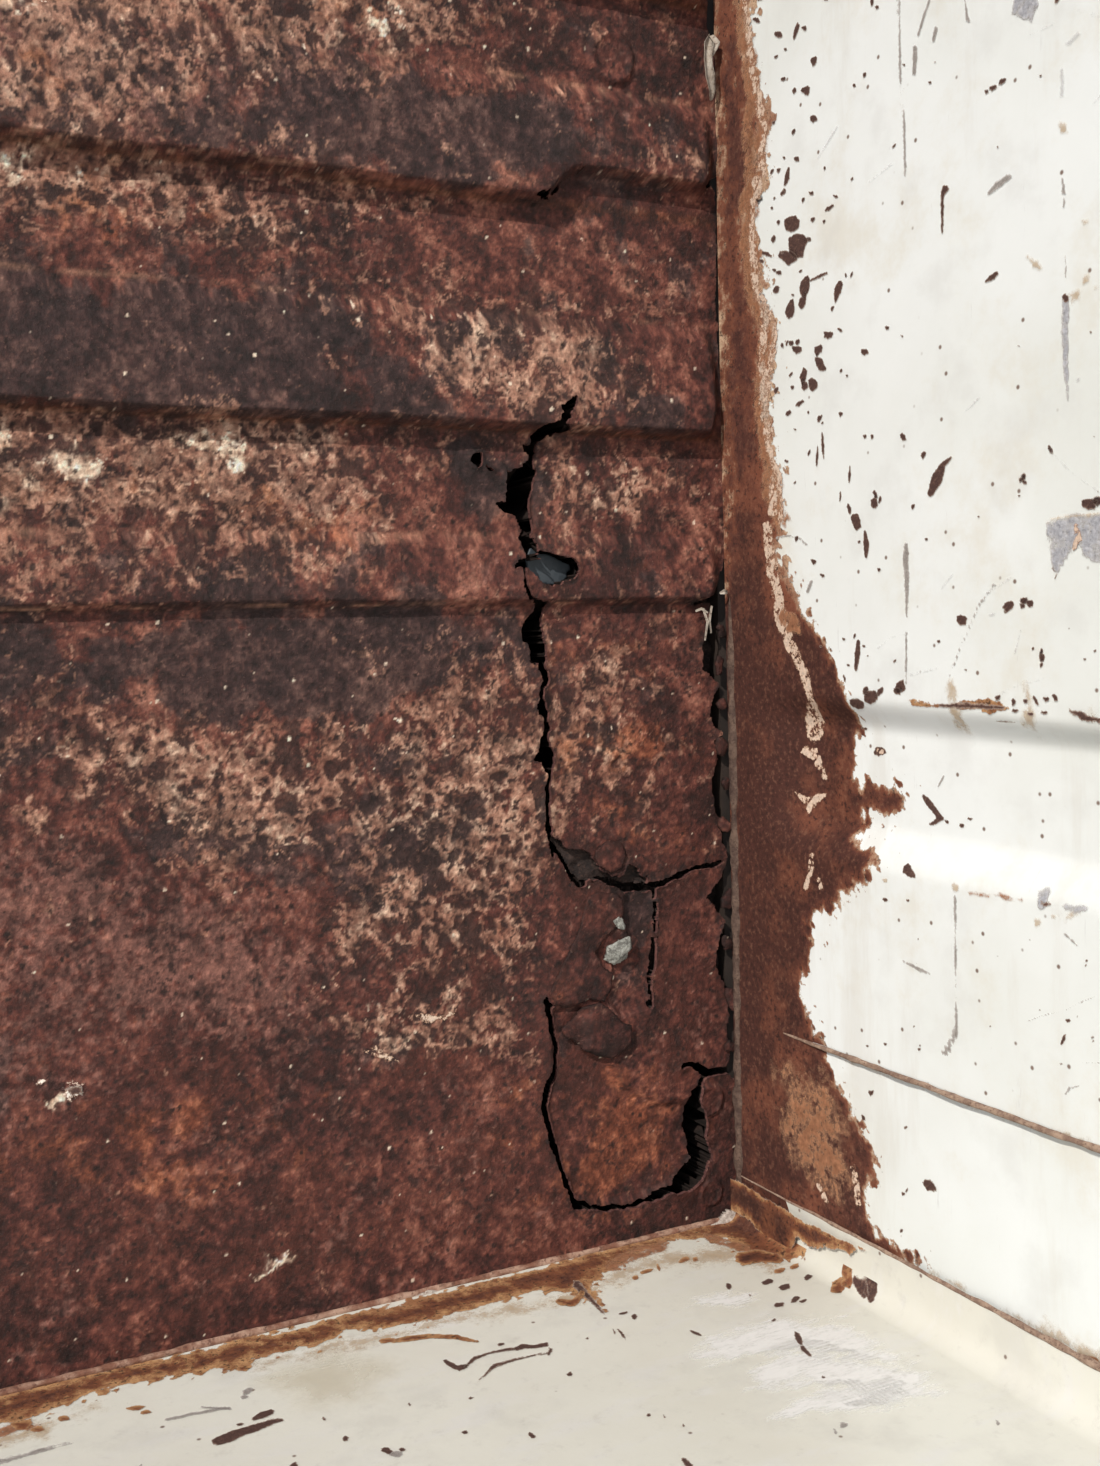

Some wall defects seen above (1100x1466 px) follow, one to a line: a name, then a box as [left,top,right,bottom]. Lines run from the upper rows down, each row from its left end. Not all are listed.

corrosion [1061,292,1079,400]
peeling [1046,491,1100,579]
crack [479,395,724,1009]
corrosion [702,625,711,677]
corrosion [713,0,932,1269]
corrosion [909,683,1100,727]
corrosion [706,886,732,909]
corrosion [550,892,632,1059]
crack [541,997,728,1213]
corrosion [0,1179,863,1442]
corrosion [830,1264,877,1303]